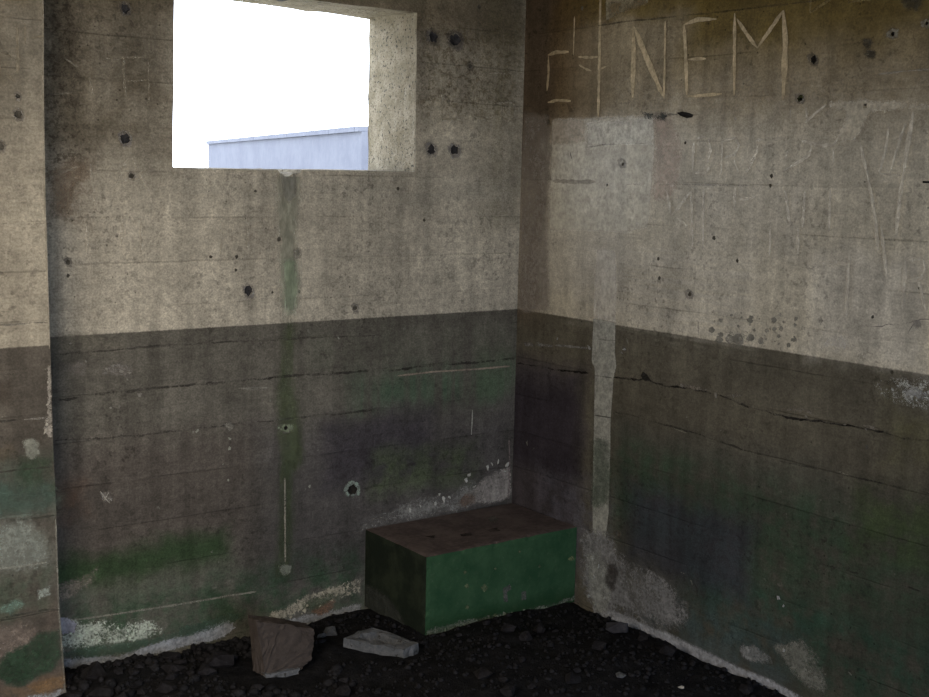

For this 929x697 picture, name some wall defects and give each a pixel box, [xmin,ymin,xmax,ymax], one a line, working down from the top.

leakage [283,175,295,200]
crack [392,358,588,376]
crack [59,382,210,401]
crack [239,370,366,390]
crack [613,372,905,440]
leakage [60,613,241,669]